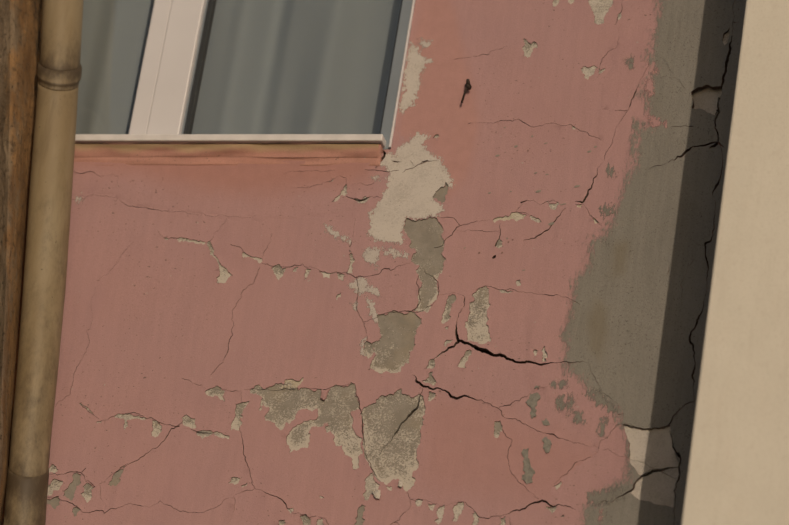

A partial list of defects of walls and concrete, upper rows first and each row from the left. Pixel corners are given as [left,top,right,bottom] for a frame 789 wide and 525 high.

peeling [588,0,613,25]
crack [715,46,732,170]
peeling [433,183,449,203]
peeling [364,217,446,374]
peeling [458,286,491,368]
crack [456,332,540,366]
peeling [47,465,93,516]
peeling [182,355,440,525]
crack [397,378,469,433]
peeling [416,499,468,525]
flaking render [623,425,679,507]
crack [634,427,681,503]